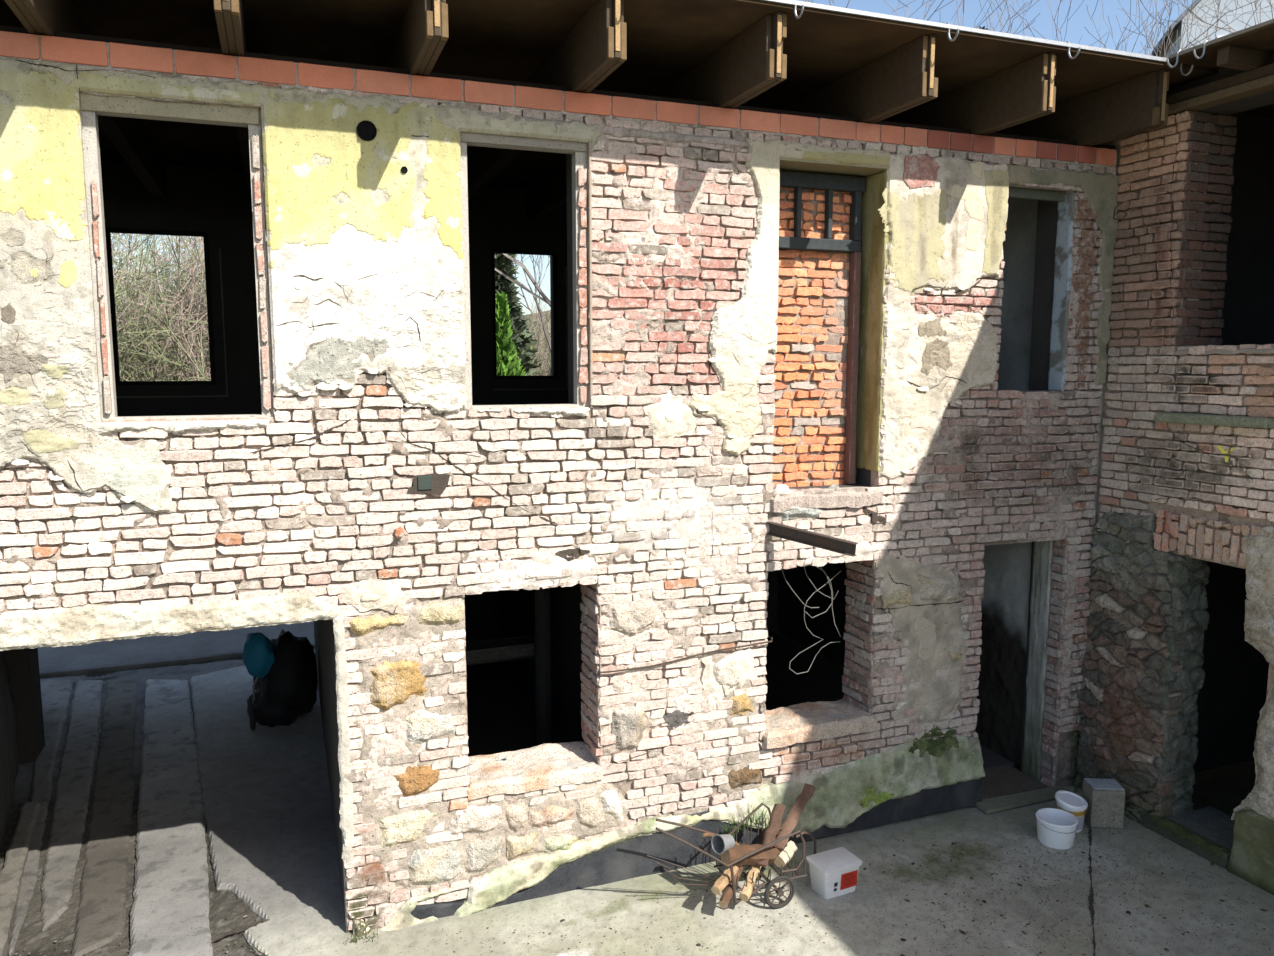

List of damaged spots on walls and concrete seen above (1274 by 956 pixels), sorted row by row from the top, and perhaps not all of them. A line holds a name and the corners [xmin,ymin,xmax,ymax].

flaking render [0,57,601,513]
crack [276,274,446,391]
flaking render [643,138,1009,480]
spalling [1073,190,1100,389]
flaking render [804,539,968,726]
spalling [1244,599,1274,794]
crack [1087,826,1096,956]